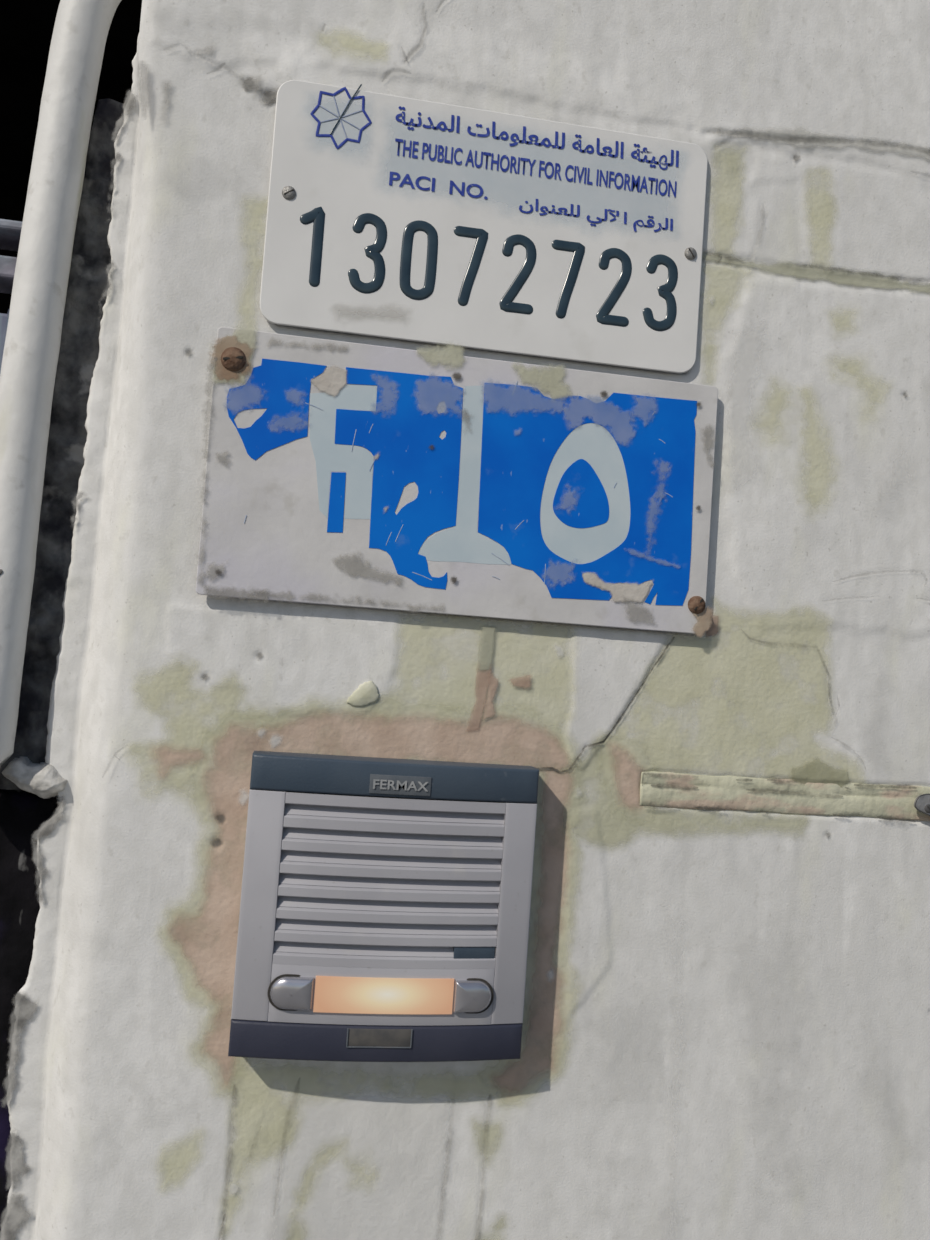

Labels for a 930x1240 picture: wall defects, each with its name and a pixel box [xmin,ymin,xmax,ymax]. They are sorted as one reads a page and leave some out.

corrosion [706,616,718,636]
crack [537,638,674,774]
spalling [32,796,64,902]
spalling [2,992,37,1106]
spalling [0,1133,30,1240]